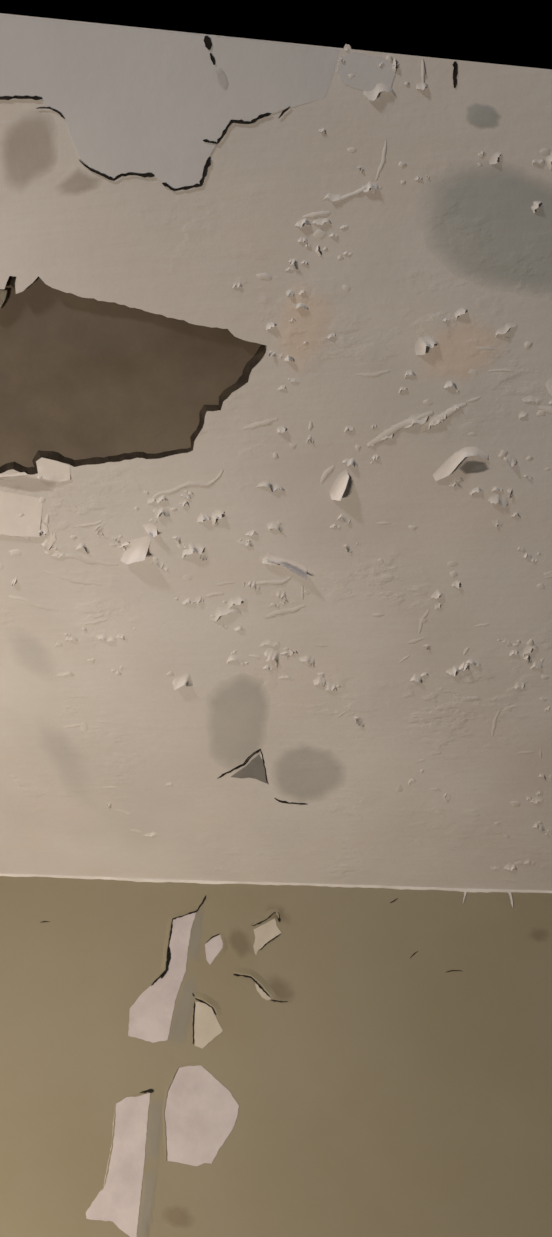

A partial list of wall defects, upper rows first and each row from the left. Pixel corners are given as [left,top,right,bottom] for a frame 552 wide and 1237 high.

peeling [363,55,428,101]
leakage [464,102,503,130]
peeling [256,140,429,281]
leakage [415,160,552,301]
peeling [414,336,438,355]
flaking render [0,276,294,586]
peeling [320,380,481,528]
peeling [174,553,310,631]
leakage [203,673,348,807]
peeling [233,967,288,1002]
peeling [250,906,281,955]
peeling [86,895,239,1237]